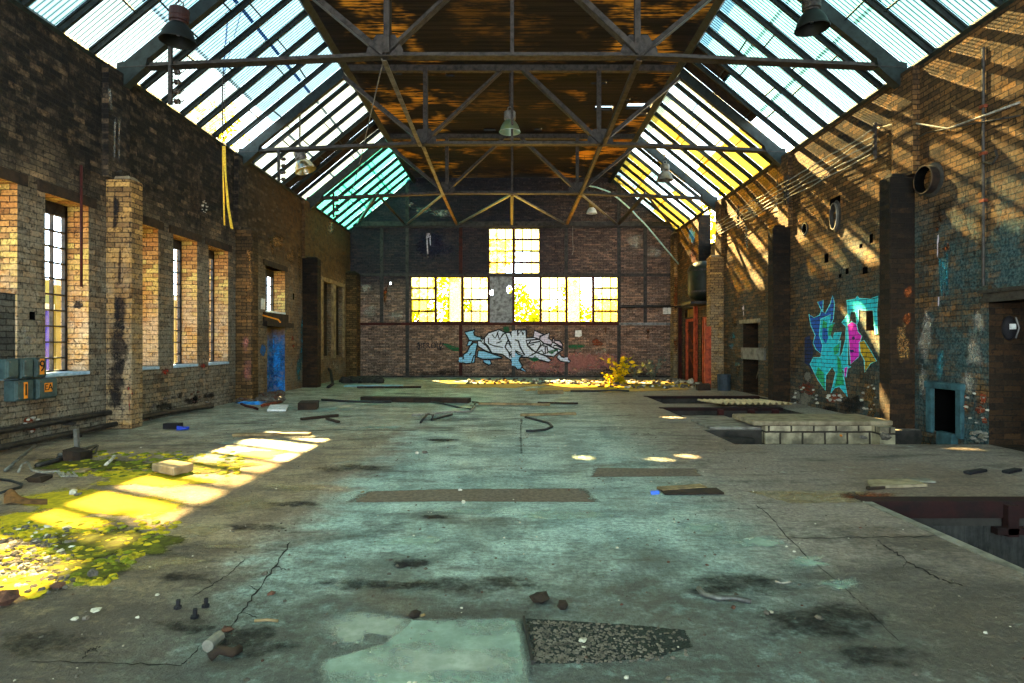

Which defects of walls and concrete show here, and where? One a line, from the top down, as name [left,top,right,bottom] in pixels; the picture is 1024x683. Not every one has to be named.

water stain [108,295,129,408]
crack [195,542,290,627]
crack [756,505,963,643]
crack [32,645,200,666]
spalling [523,616,694,665]